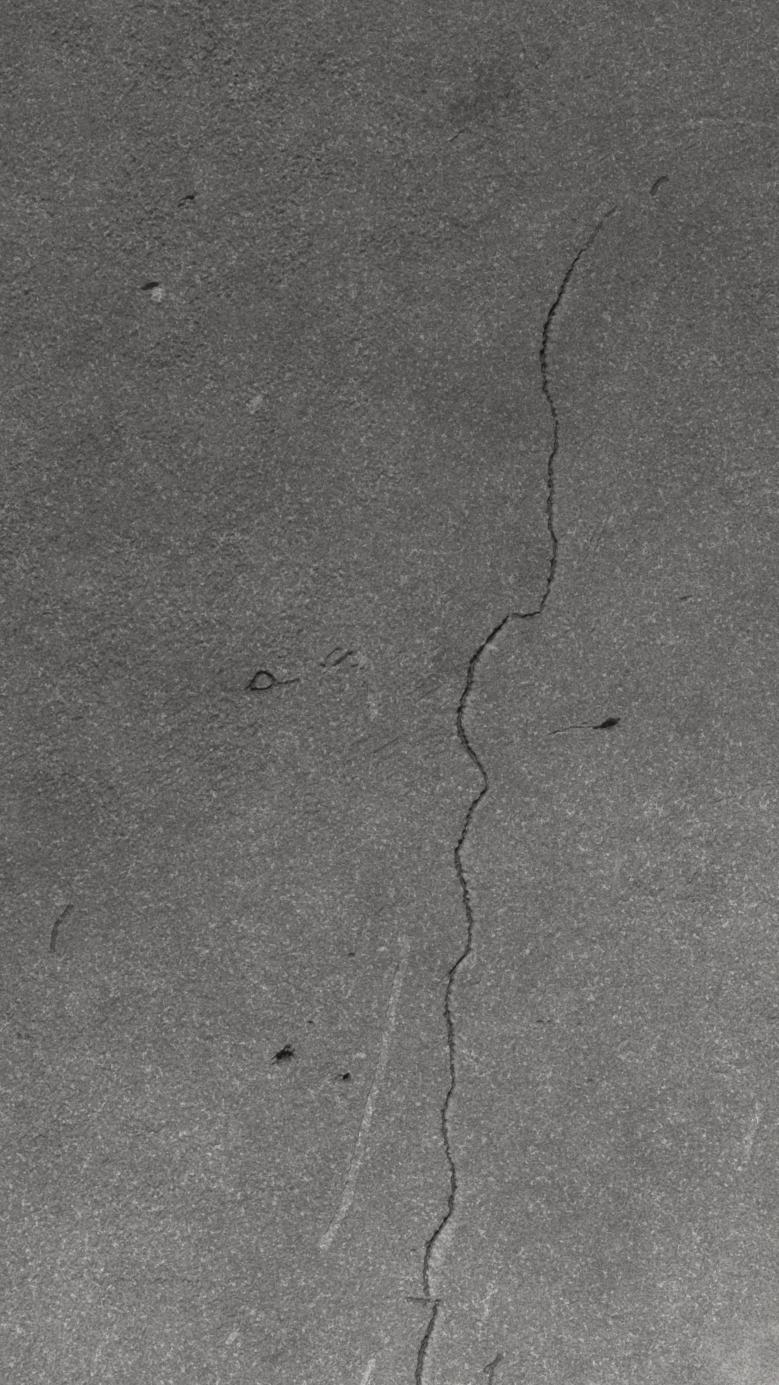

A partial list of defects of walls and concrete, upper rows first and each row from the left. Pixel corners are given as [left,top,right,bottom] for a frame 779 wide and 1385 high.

crack [650,175,670,196]
crack [406,205,617,1385]